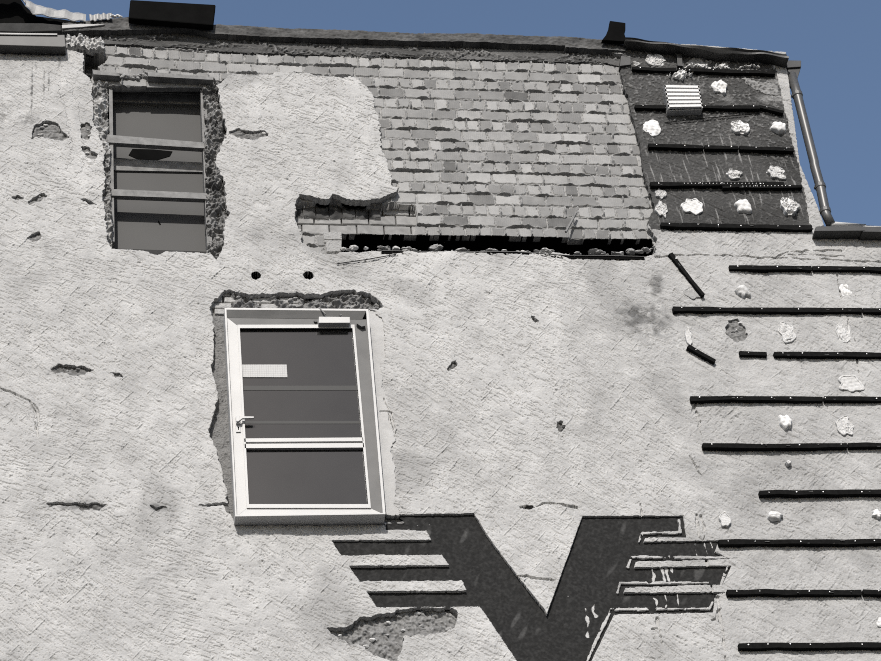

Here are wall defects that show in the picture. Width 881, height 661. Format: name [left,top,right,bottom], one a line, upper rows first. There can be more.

spalling [205,292,380,518]
spalling [330,610,457,661]